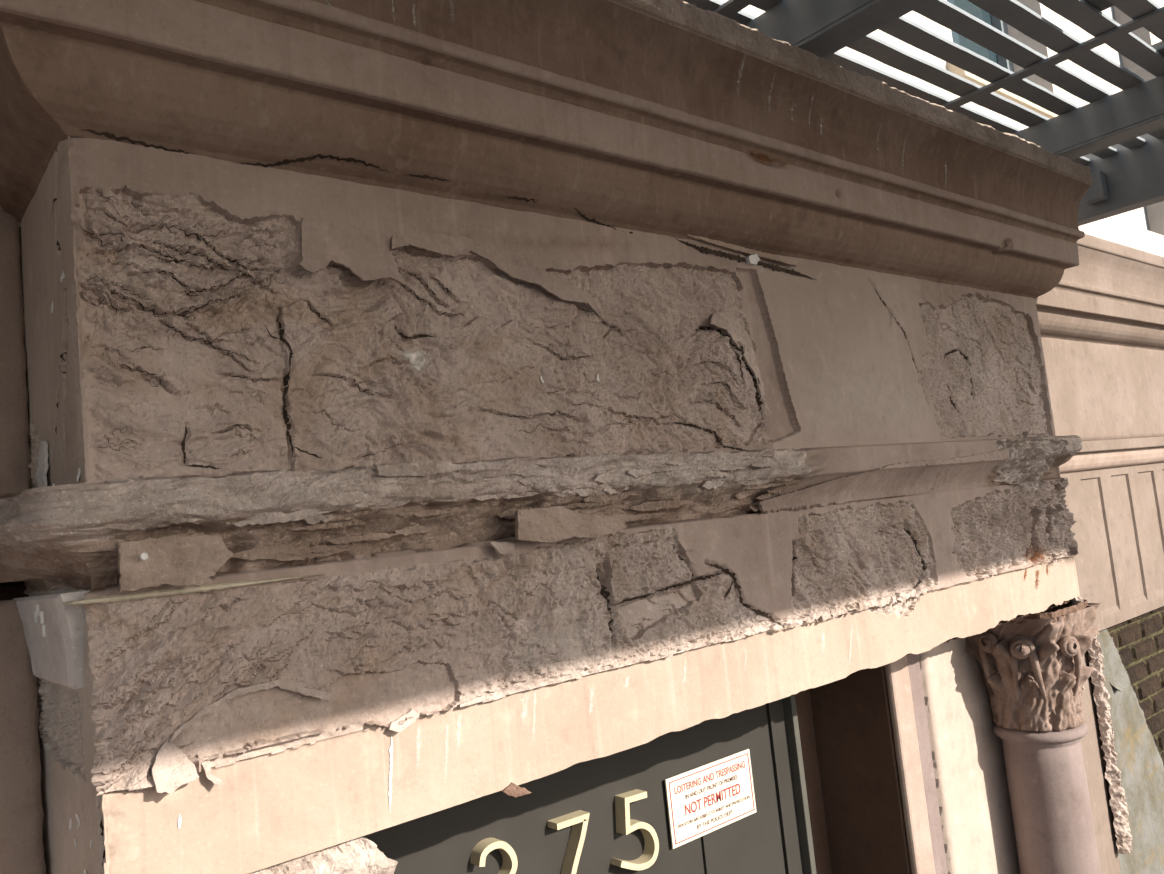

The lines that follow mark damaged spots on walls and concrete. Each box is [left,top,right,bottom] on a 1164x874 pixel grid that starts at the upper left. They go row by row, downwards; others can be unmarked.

crack [80,129,195,154]
crack [675,238,817,281]
crack [263,315,322,459]
crack [696,326,763,420]
crack [875,289,973,409]
peeling [28,420,49,488]
crack [181,424,220,469]
spalling [37,185,1078,794]
crack [671,422,748,451]
crack [596,545,785,641]
flaking render [1081,628,1164,874]
spalling [248,836,398,874]